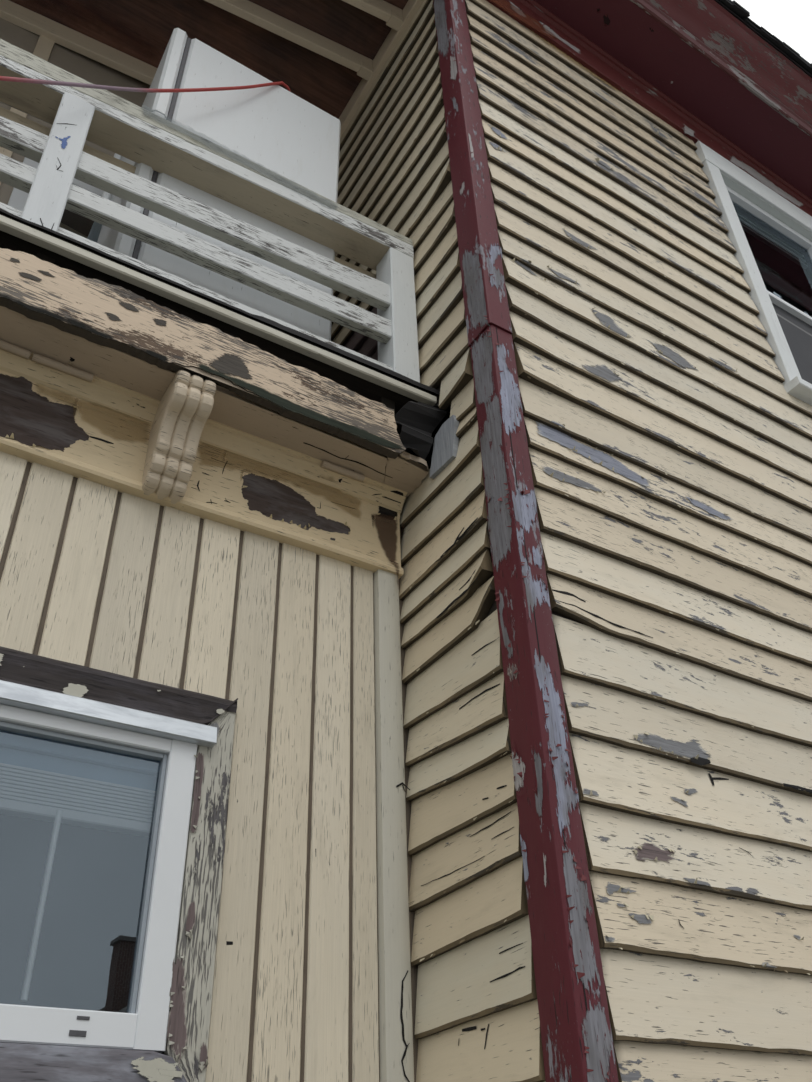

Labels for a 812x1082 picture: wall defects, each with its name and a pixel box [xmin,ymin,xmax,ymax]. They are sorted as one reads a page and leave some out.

peeling [730,157,803,207]
spalling [0,374,90,452]
spalling [241,473,351,541]
peeling [461,243,581,623]
peeling [541,465,605,493]
peeling [535,420,650,487]
crack [552,589,653,638]
peeling [633,732,712,759]
peeling [191,752,204,833]
peeling [510,648,612,1082]
peeling [167,953,188,1064]
crack [400,970,410,1082]